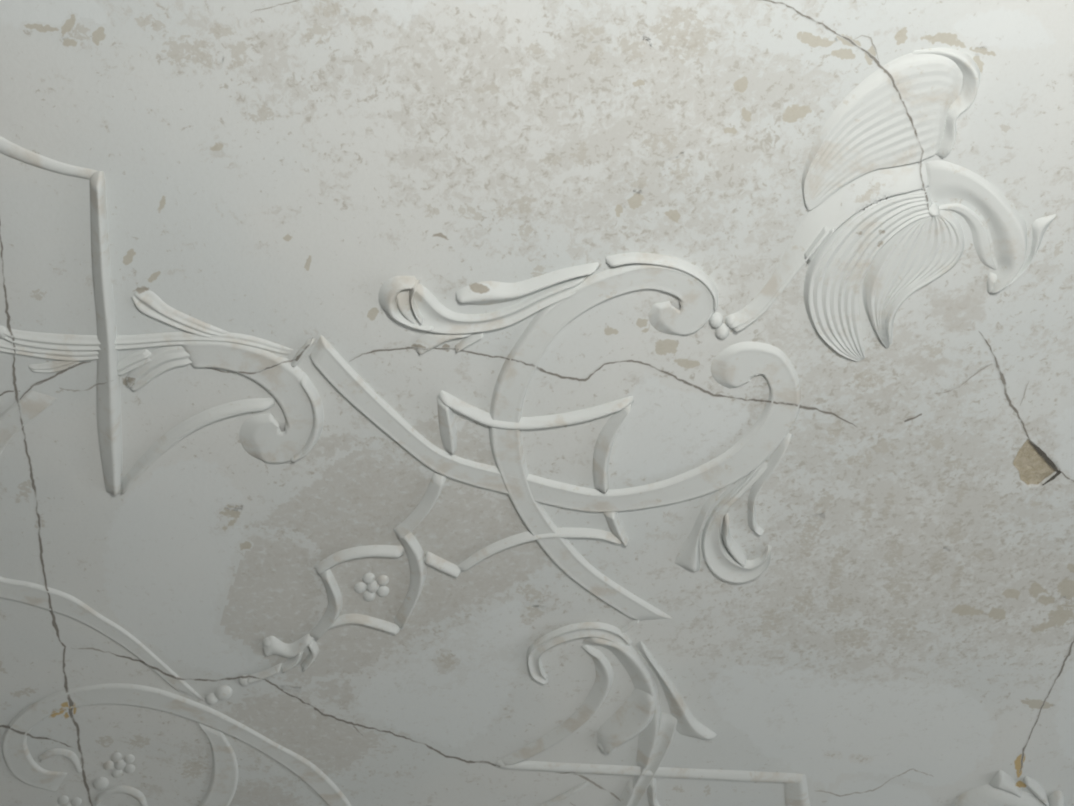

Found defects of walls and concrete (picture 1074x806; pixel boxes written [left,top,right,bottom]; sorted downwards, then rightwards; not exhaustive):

crack [762,0,930,213]
crack [349,346,858,428]
crack [904,331,1030,439]
crack [0,220,500,806]
spalling [1013,439,1062,486]
crack [1019,639,1074,773]